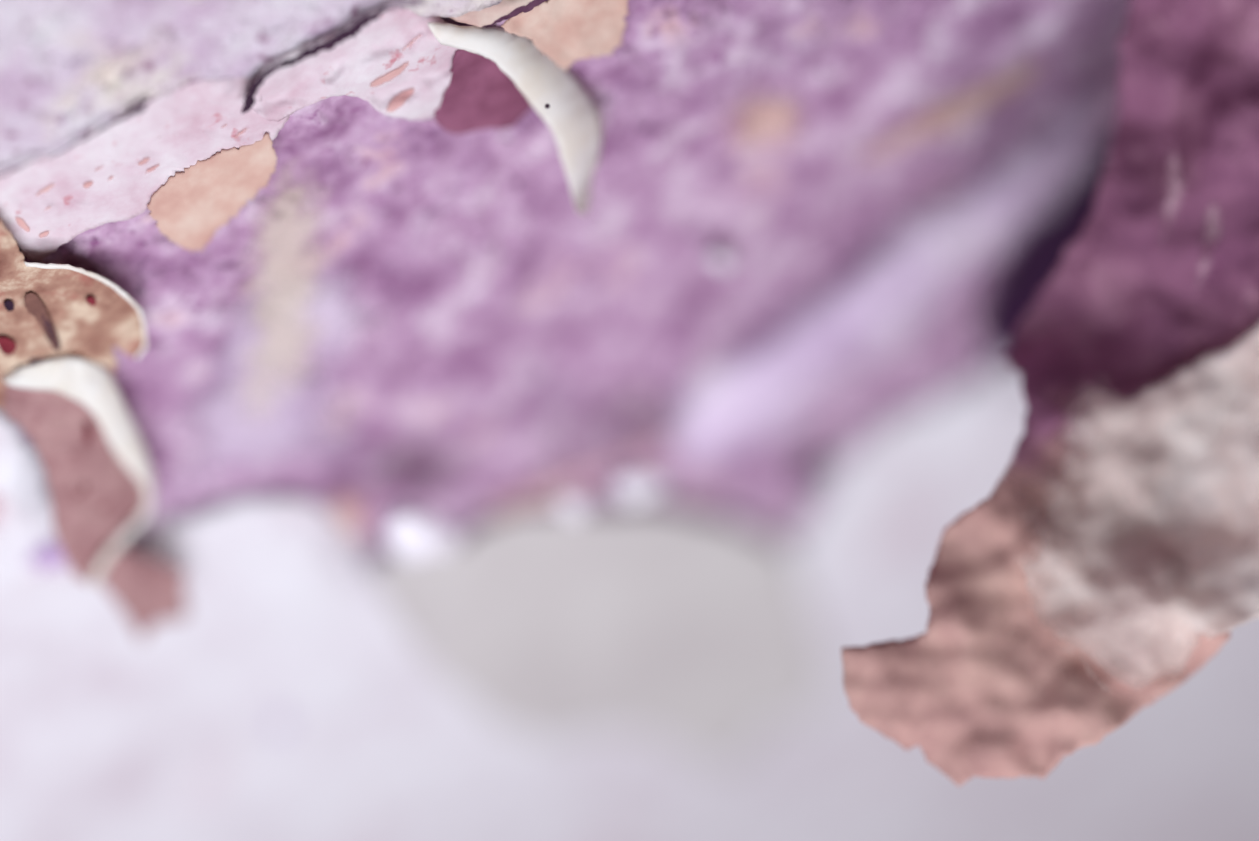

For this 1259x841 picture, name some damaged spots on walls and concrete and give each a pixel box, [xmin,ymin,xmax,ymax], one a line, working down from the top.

peeling [0,0,629,642]
peeling [842,0,1259,787]